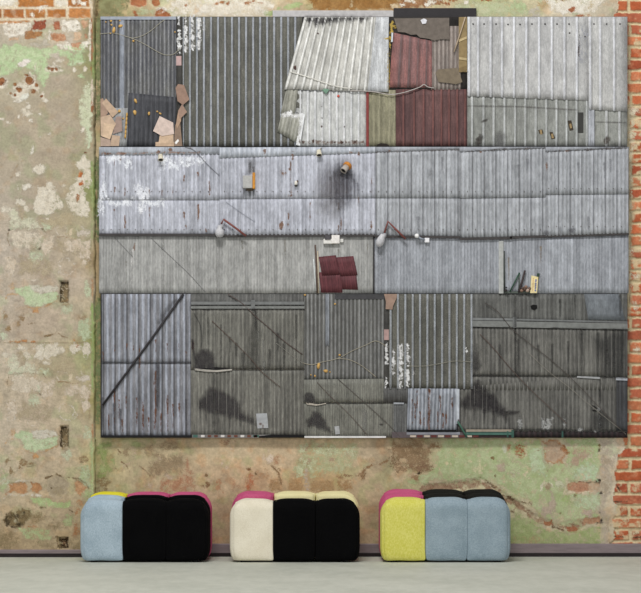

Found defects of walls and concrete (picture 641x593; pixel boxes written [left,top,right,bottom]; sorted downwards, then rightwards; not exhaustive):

spalling [0,0,166,275]
peeling [160,155,206,171]
peeling [0,449,93,543]
peeling [396,425,641,544]